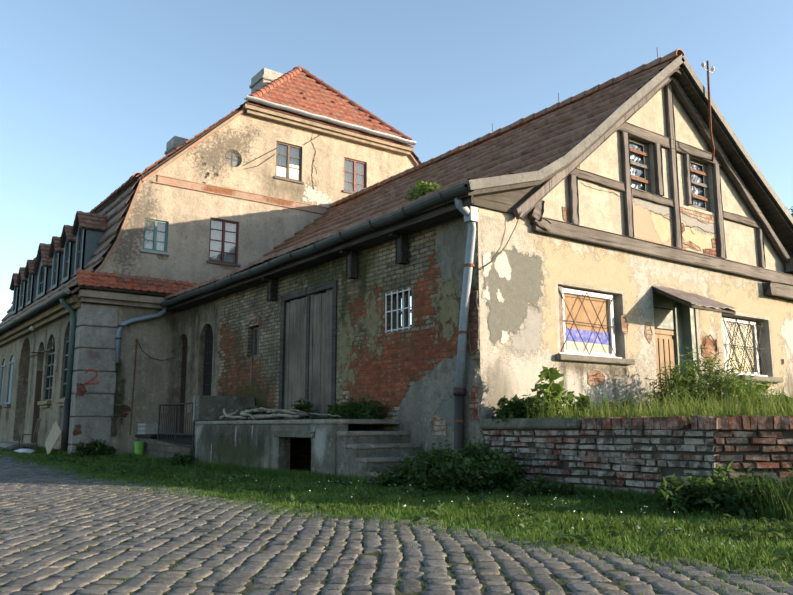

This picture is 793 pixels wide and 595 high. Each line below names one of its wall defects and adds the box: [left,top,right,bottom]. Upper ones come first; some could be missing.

crack [310,132,318,190]
flaking render [267,181,333,207]
peeling [632,196,719,257]
spalling [217,258,340,420]
peeling [336,216,793,456]